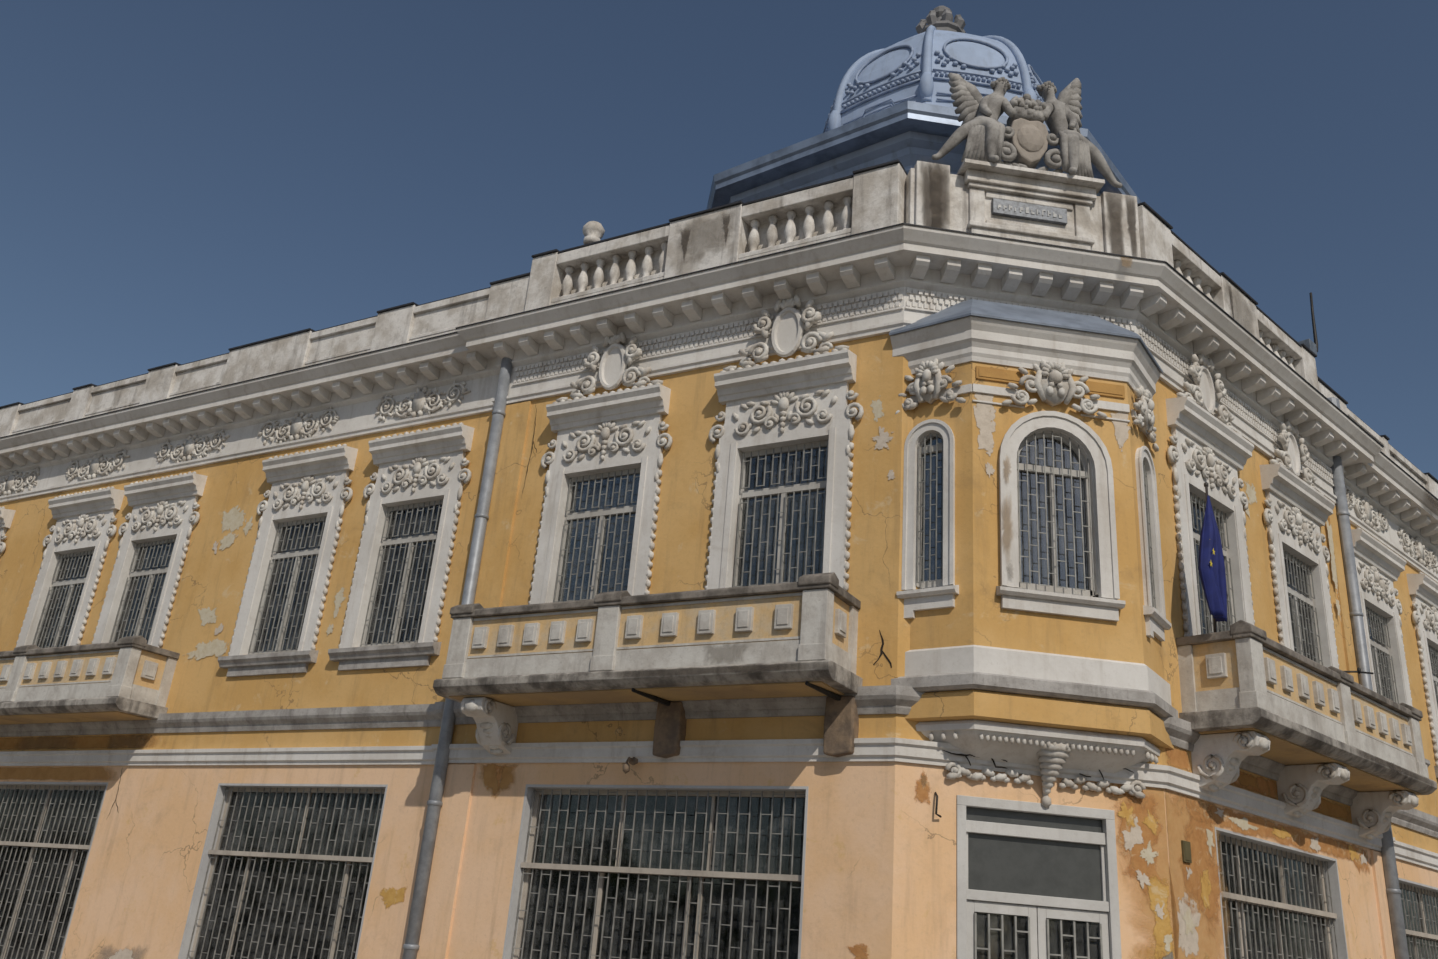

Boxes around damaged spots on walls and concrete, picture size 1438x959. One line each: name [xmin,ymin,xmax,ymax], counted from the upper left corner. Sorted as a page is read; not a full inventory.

crack [873,630,892,668]
peeling [1118,796,1201,959]